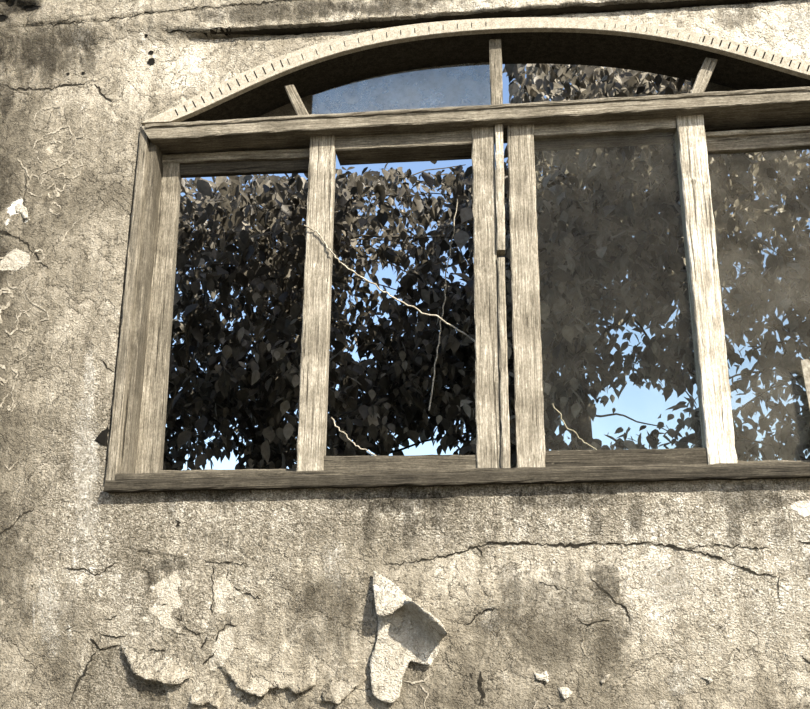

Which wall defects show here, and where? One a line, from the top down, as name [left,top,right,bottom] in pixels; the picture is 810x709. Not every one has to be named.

crack [19,0,781,37]
flaking render [124,570,194,636]
peeling [200,571,447,704]
flaking render [79,646,193,709]
flaking render [190,693,225,709]